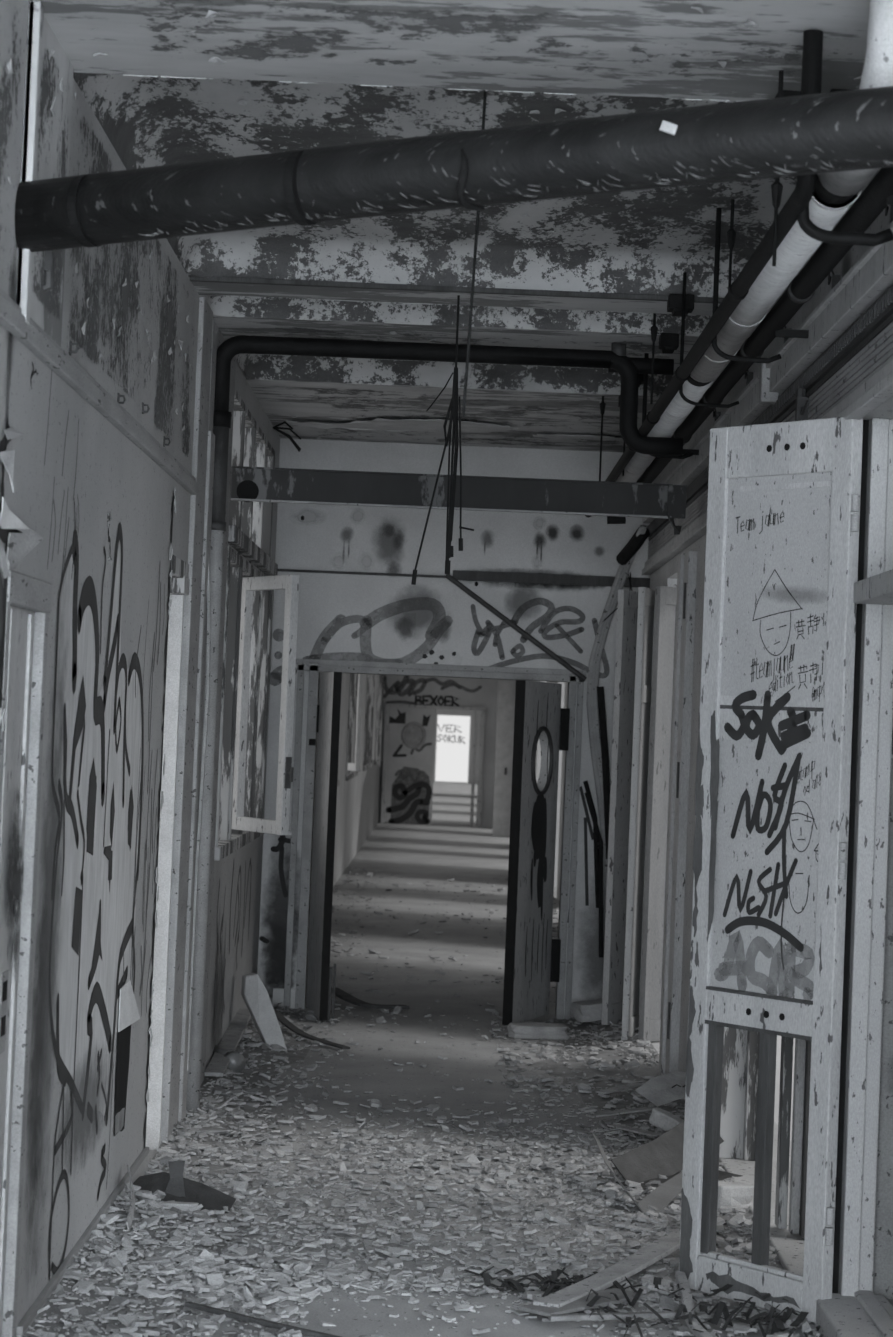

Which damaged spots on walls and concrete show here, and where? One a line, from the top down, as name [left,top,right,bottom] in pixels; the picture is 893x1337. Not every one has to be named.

peeling [0,9,21,190]
peeling [38,0,742,178]
peeling [628,19,803,78]
peeling [32,176,797,457]